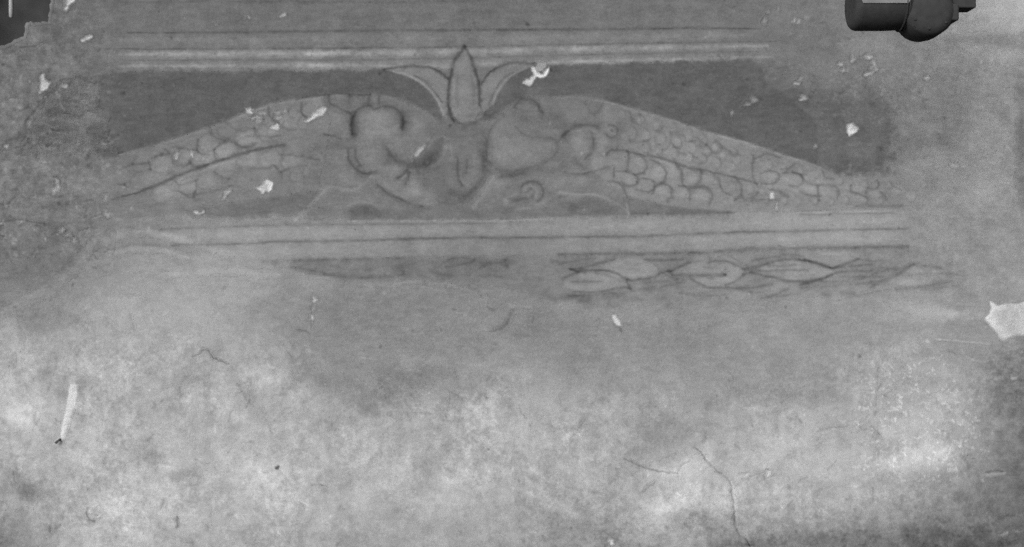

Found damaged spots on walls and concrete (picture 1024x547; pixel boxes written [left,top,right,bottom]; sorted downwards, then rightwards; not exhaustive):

peeling [37,73,70,95]
peeling [520,58,552,88]
peeling [302,105,329,125]
peeling [844,121,860,139]
peeling [254,177,275,195]
crack [624,443,764,547]